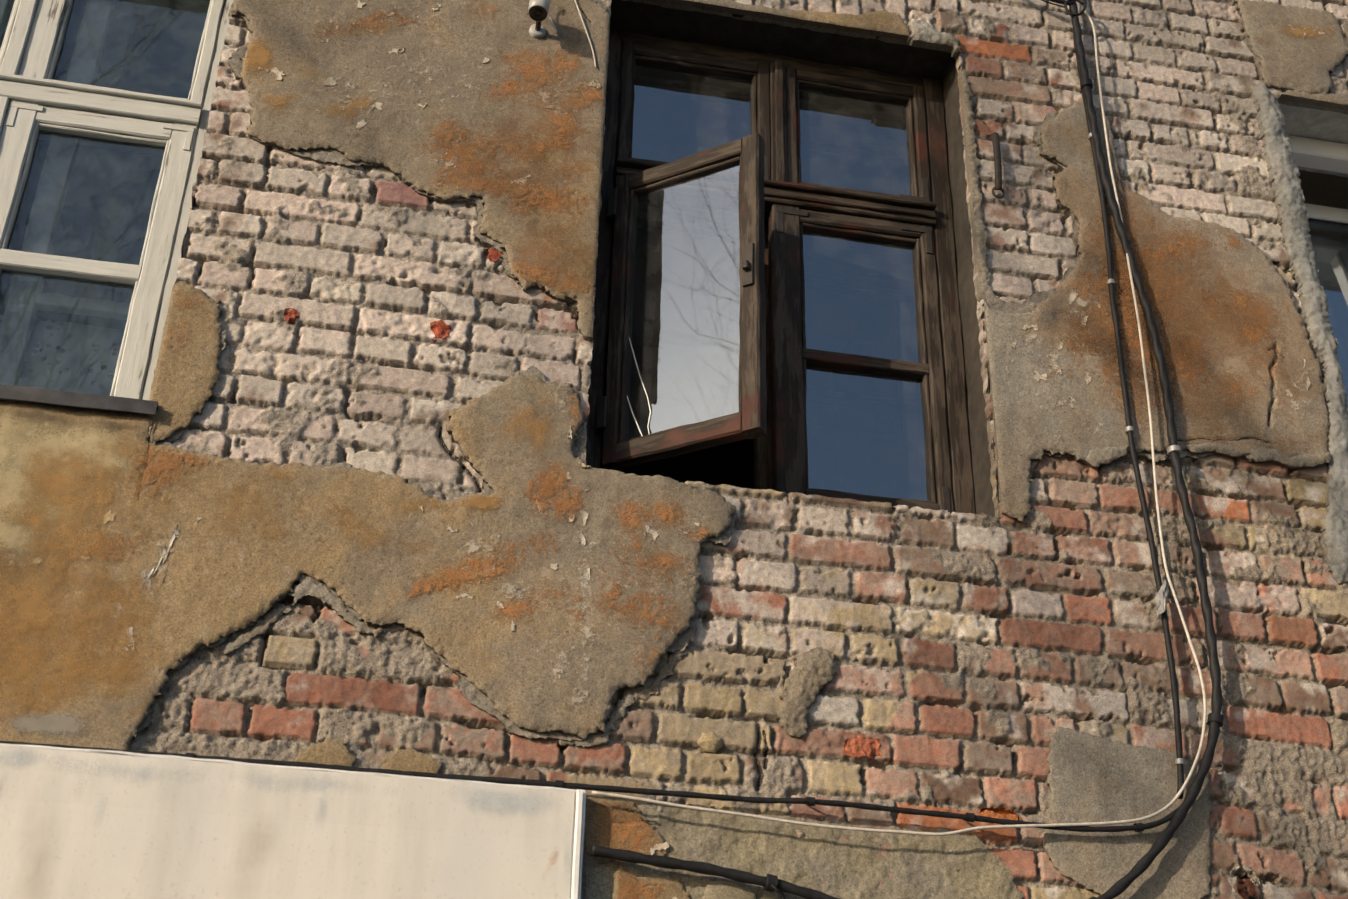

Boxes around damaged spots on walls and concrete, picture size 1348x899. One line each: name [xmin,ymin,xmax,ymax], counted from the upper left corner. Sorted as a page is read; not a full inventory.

peeling [650,0,910,41]
peeling [1232,0,1348,111]
peeling [227,0,610,342]
peeling [979,100,1331,522]
peeling [0,281,737,750]
peeling [291,738,356,767]
peeling [380,746,441,773]
spalling [842,734,882,761]
spalling [978,807,1021,821]
spalling [1227,865,1260,899]